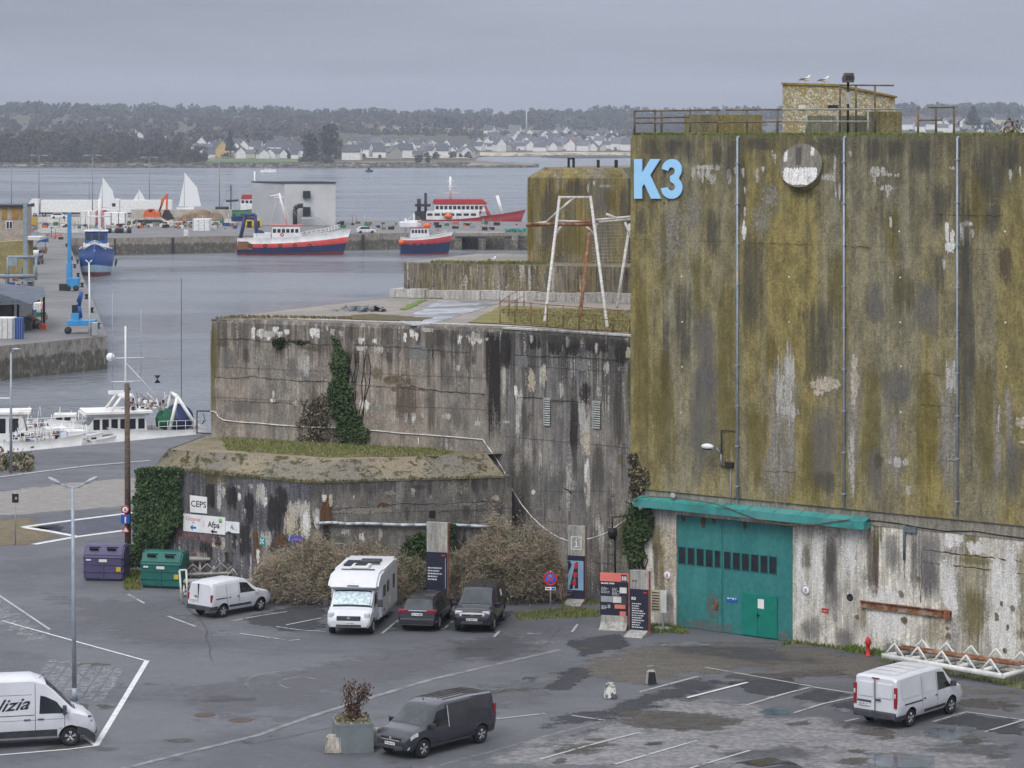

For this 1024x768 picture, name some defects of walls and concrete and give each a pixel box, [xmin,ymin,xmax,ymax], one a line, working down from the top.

leakage [670,139,782,322]
leakage [219,327,290,369]
leakage [310,324,391,382]
leakage [399,300,630,573]
leakage [764,305,834,504]
spalling [810,376,841,396]
leakage [846,350,863,511]
leakage [918,166,975,498]
leakage [186,483,290,564]
peeling [283,500,312,541]
corrosion [320,494,334,543]
leakage [795,528,911,653]